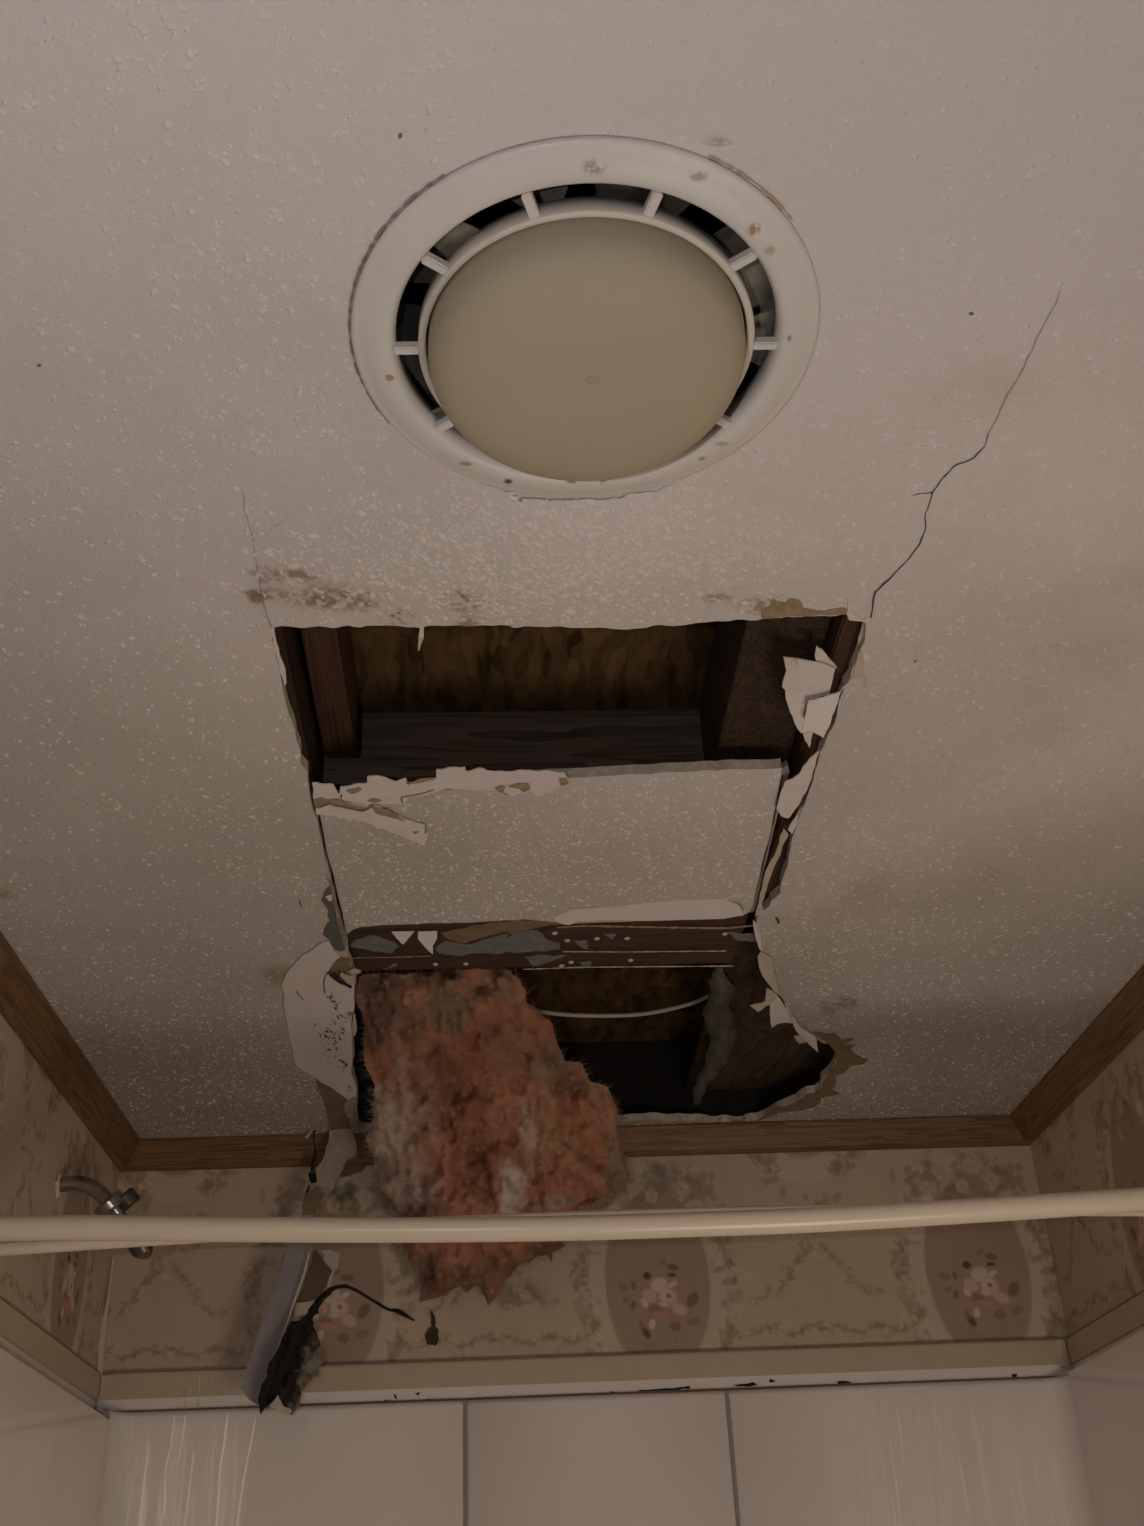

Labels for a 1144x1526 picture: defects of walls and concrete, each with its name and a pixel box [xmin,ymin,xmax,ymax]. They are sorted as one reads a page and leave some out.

crack [870,291,1060,618]
leakage [289,572,369,609]
peeling [282,876,361,1107]